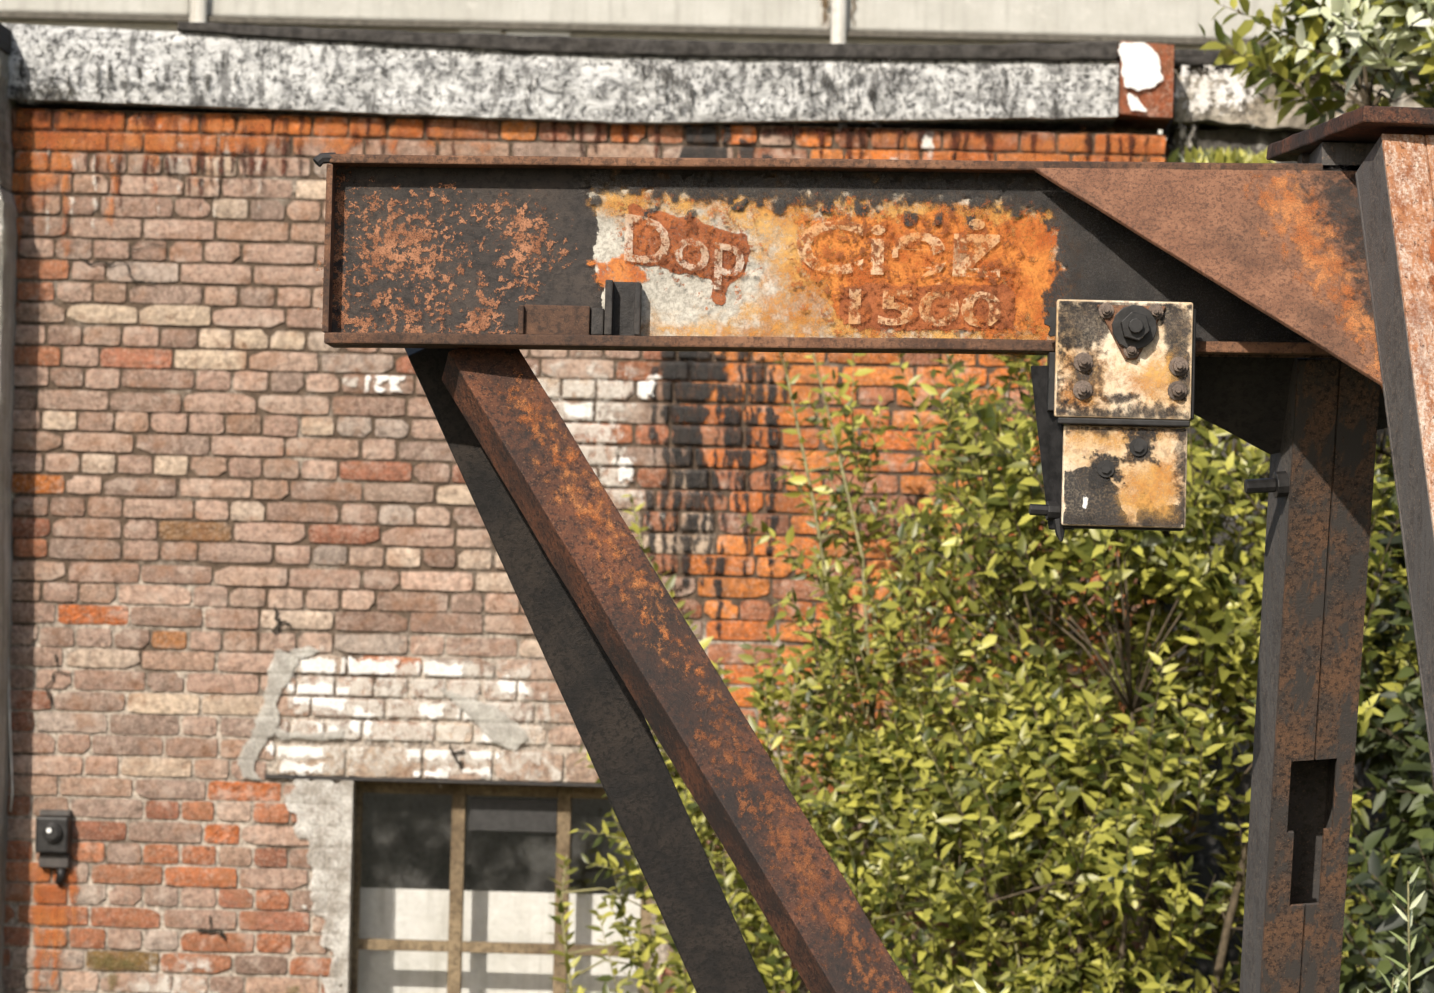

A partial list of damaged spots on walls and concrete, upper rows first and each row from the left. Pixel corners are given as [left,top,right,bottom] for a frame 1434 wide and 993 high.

peeling [1127,93,1147,112]
rust [11,111,1065,364]
peeling [587,188,1065,340]
rust [1244,174,1380,377]
rust [509,374,625,556]
water stain [532,351,791,639]
rust [1120,461,1180,522]
rust [1130,356,1171,398]
rust [623,570,682,646]
peeling [204,647,562,993]
rust [686,664,894,993]